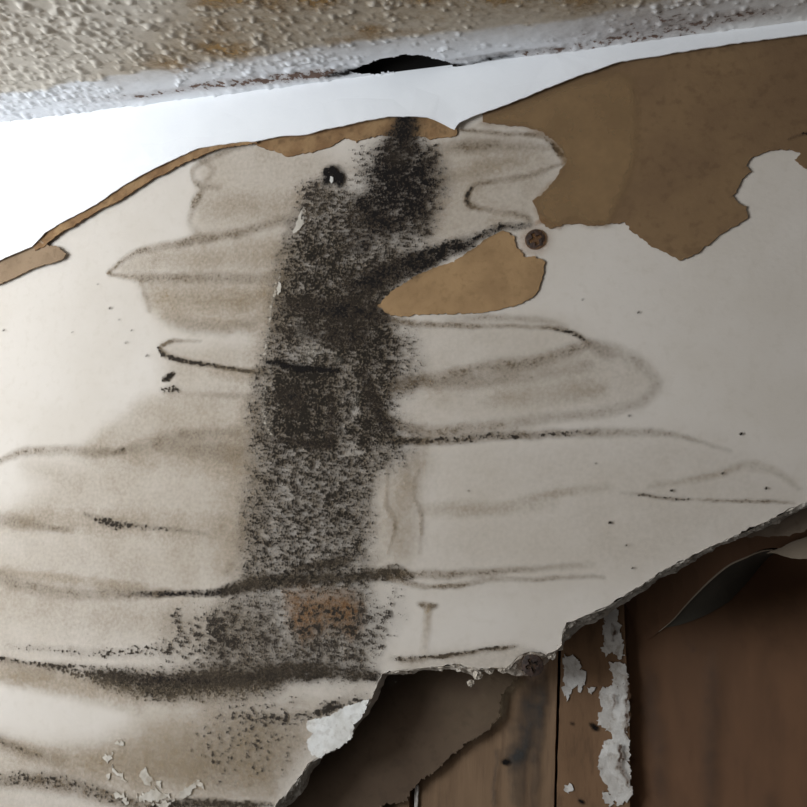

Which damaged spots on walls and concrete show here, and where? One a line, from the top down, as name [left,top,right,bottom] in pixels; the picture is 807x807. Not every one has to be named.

water stain [575,9,773,49]
water stain [176,69,335,92]
crack [328,51,517,77]
water stain [458,132,566,165]
water stain [491,326,585,369]
water stain [0,117,529,785]
peeling [274,502,807,807]